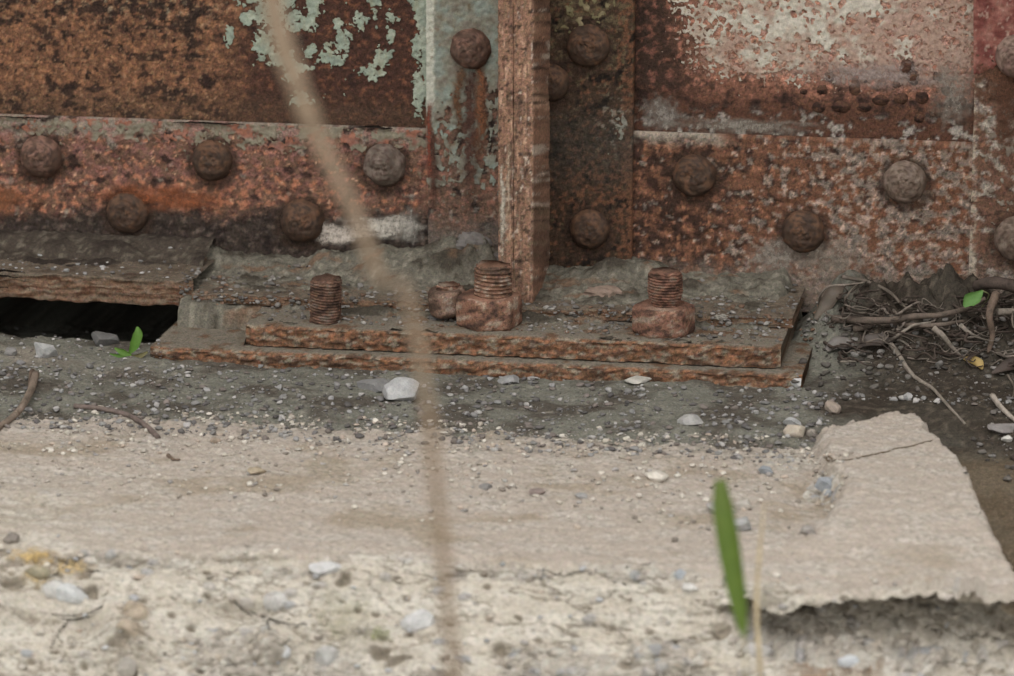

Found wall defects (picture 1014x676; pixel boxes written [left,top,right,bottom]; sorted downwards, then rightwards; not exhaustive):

peeling [223,0,284,80]
peeling [283,0,401,82]
peeling [0,116,318,165]
peeling [323,0,498,197]
rust [426,106,437,206]
rust [452,68,486,181]
rust [500,150,511,239]
rust [800,58,942,123]